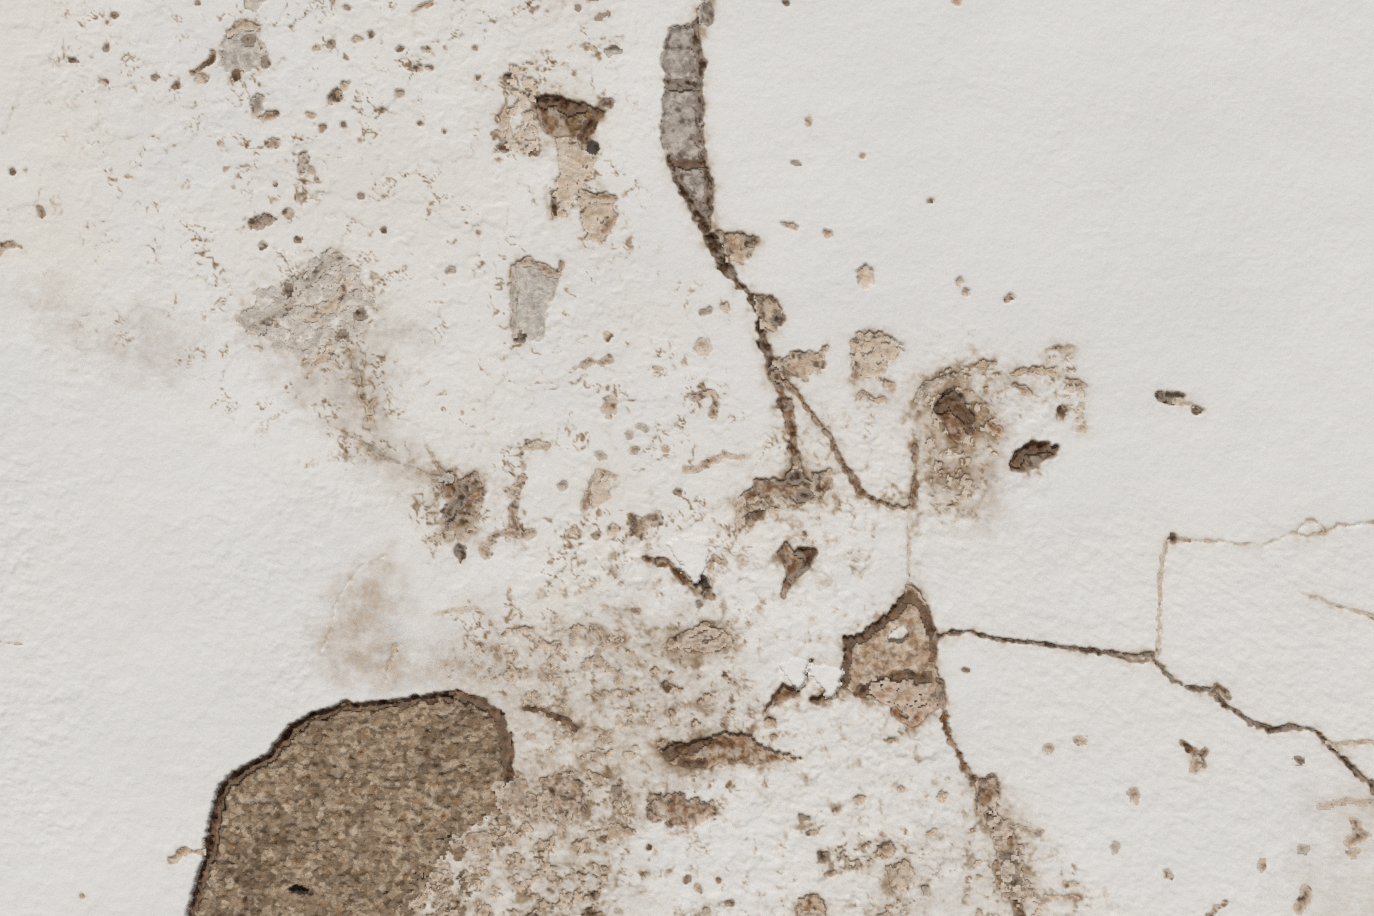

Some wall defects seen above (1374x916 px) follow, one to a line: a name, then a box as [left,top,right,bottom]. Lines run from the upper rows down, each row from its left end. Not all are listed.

flaking render [495,62,618,244]
peeling [234,248,377,424]
peeling [509,256,563,346]
crack [660,0,919,588]
flaking render [347,434,493,564]
flaking render [914,346,1088,509]
flaking render [169,511,945,916]
crack [936,677,1035,916]
crack [932,522,1374,810]